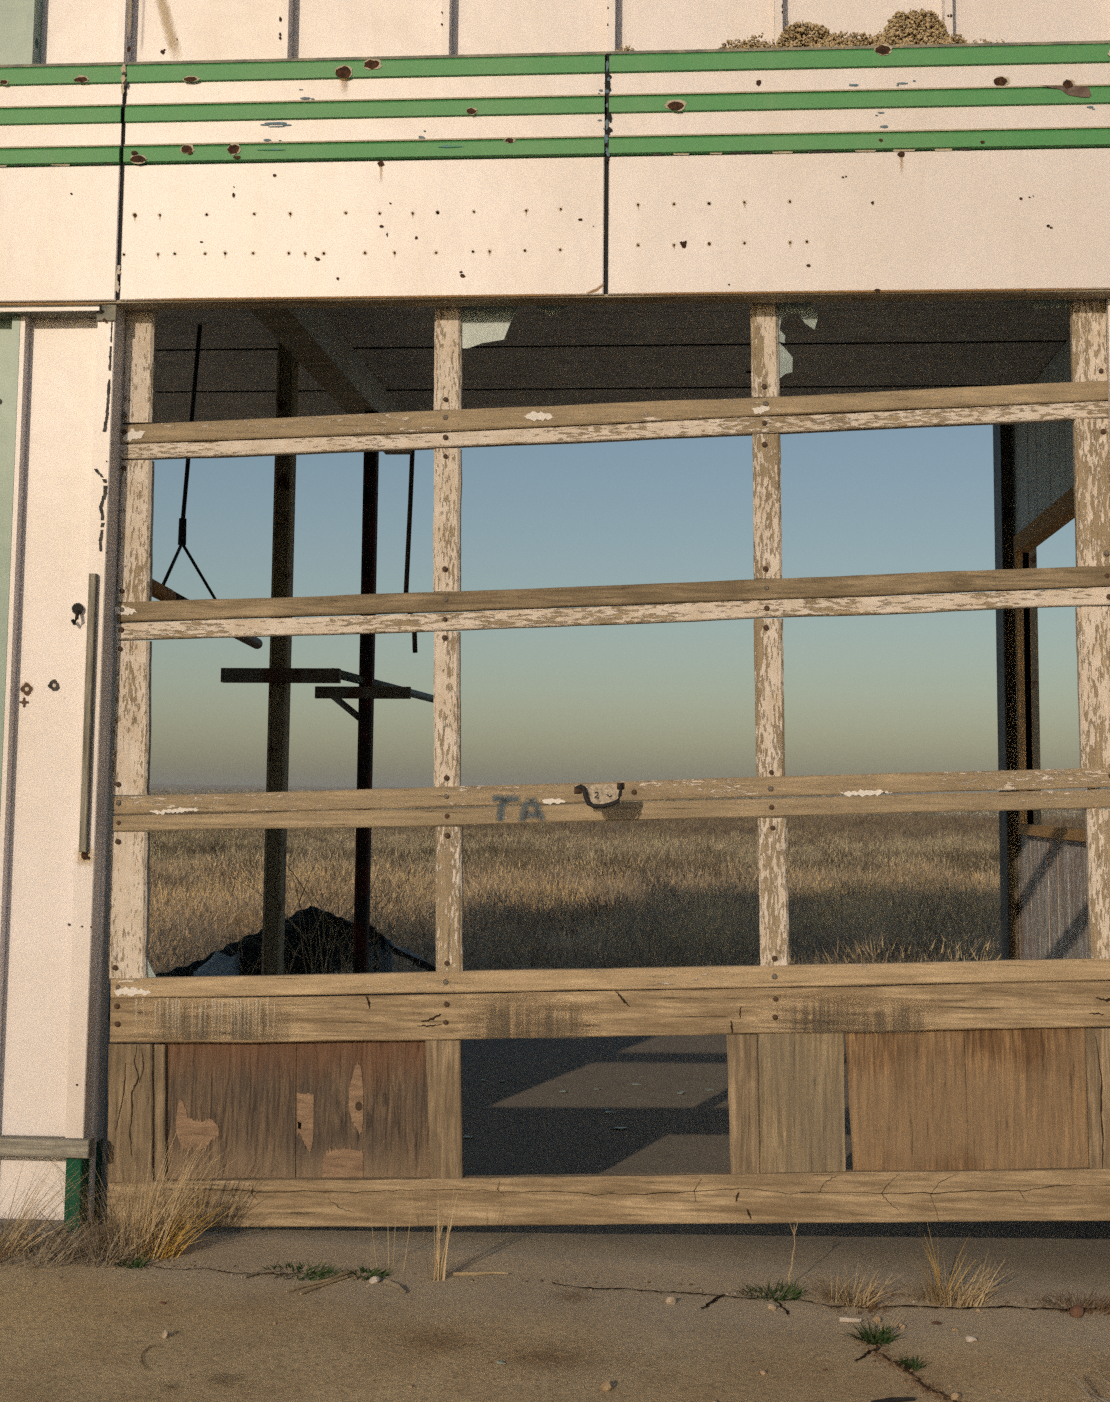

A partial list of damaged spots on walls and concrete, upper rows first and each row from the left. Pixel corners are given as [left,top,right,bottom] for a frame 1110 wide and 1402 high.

corrosion [335,59,382,79]
corrosion [664,99,687,111]
corrosion [130,151,147,164]
corrosion [180,143,195,155]
corrosion [227,143,241,159]
crack [552,1282,1108,1402]